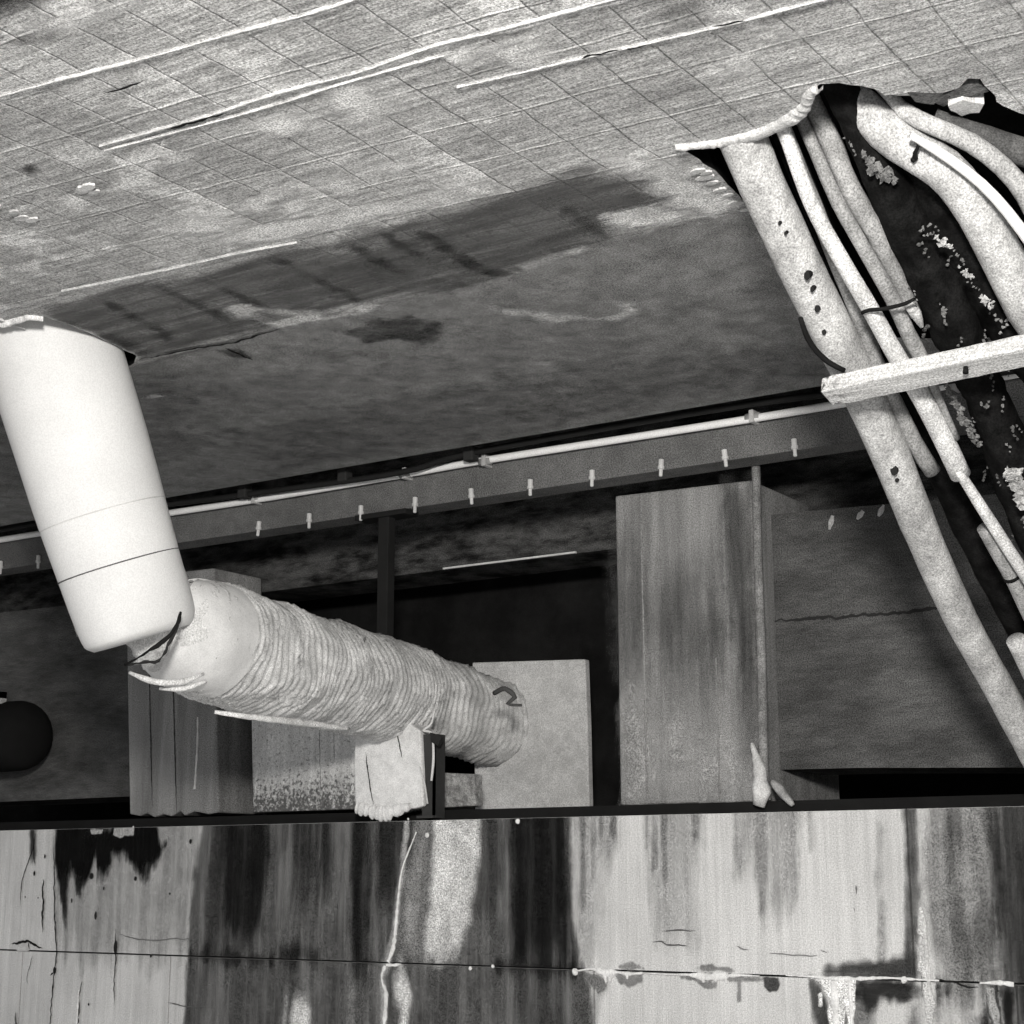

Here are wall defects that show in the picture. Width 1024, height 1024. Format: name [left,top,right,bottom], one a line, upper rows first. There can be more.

spalling [892,78,989,116]
peeling [690,167,748,212]
water stain [49,160,739,355]
spalling [804,270,817,292]
crack [775,607,937,622]
water stain [55,827,167,924]
water stain [184,806,1024,1024]